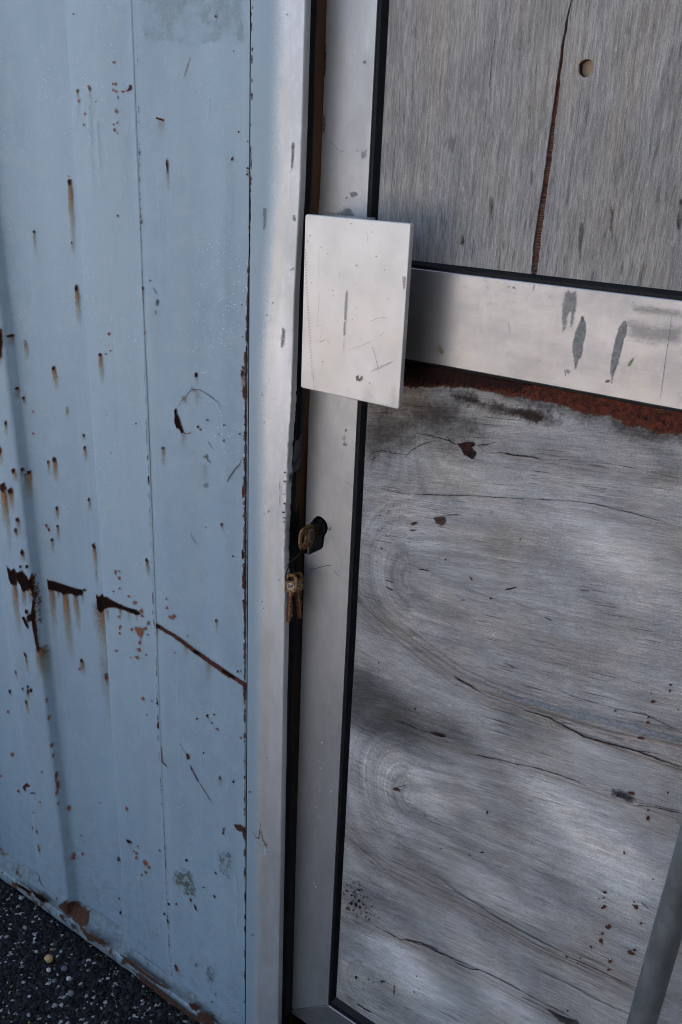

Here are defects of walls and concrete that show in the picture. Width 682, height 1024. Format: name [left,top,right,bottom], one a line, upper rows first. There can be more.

crack [532,12,570,274]
rust [403,359,682,435]
rust [0,467,31,534]
rust [6,125,252,1003]
rust [120,954,215,1024]